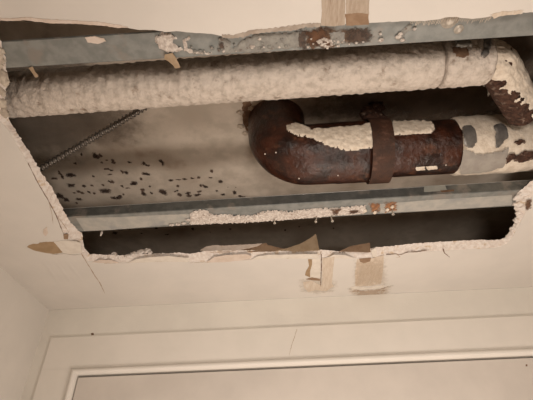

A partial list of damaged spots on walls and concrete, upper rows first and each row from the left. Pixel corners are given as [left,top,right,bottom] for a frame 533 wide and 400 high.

corrosion [296,26,372,49]
spalling [236,101,254,136]
damp [52,153,166,204]
crack [28,163,69,234]
corrosion [349,202,397,215]
peeling [27,227,82,254]